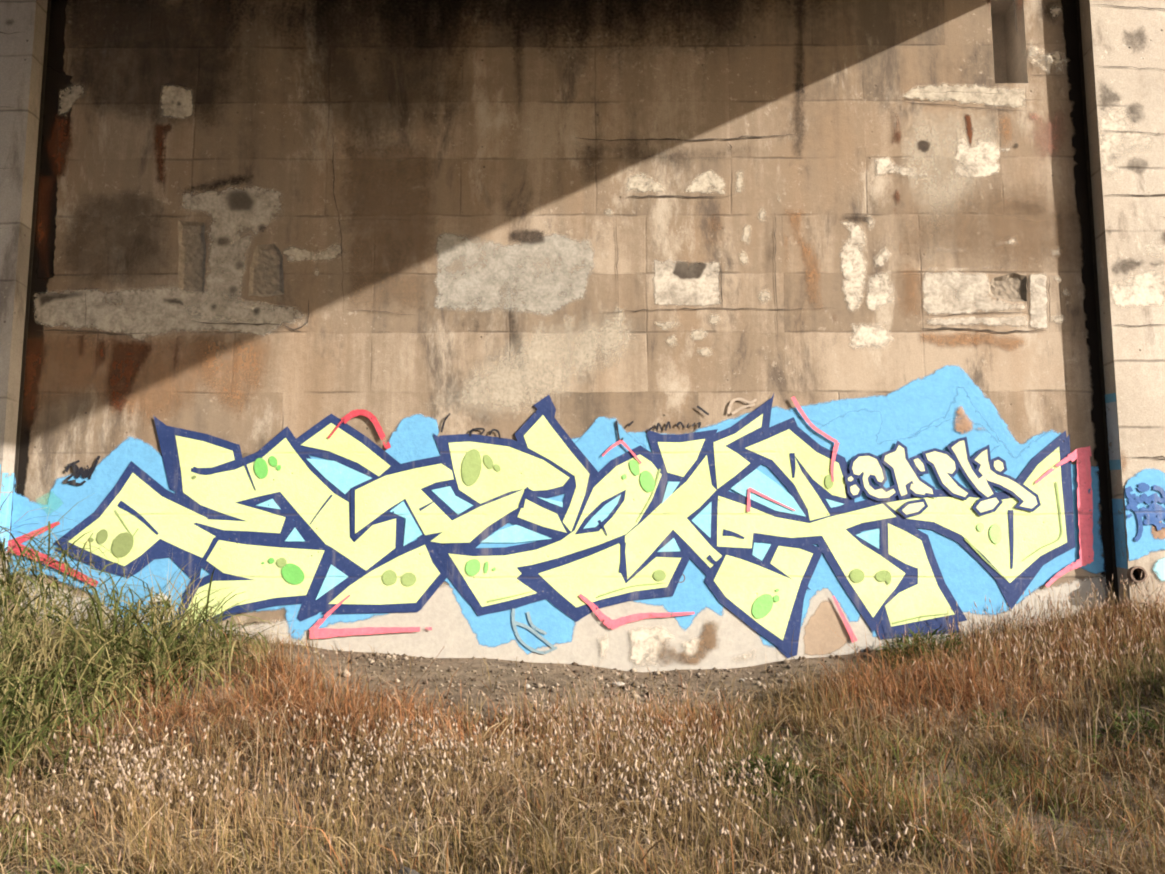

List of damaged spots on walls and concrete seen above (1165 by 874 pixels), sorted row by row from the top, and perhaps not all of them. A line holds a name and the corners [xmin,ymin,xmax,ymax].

corrosion [965,115,973,144]
corrosion [155,125,171,181]
corrosion [36,117,71,263]
damp [27,0,233,343]
damp [191,176,252,209]
peeling [628,174,664,192]
peeling [686,171,742,194]
damp [510,230,544,243]
spalling [988,273,1027,302]
peeling [929,316,1028,326]
corrosion [97,341,151,411]
damp [16,377,40,497]